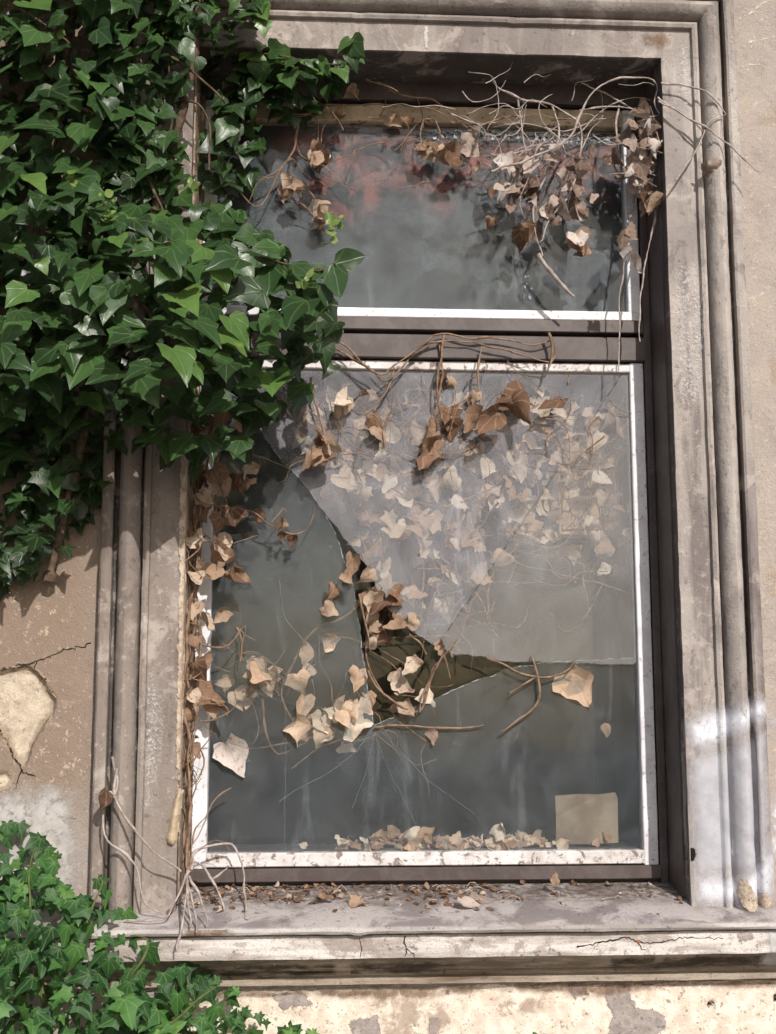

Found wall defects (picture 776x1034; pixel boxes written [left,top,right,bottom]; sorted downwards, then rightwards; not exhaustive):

crack [1,642,91,671]
flaking render [0,665,56,792]
crack [0,729,76,819]
water stain [697,742,776,902]
crack [576,937,723,950]
flaking render [177,980,776,1034]